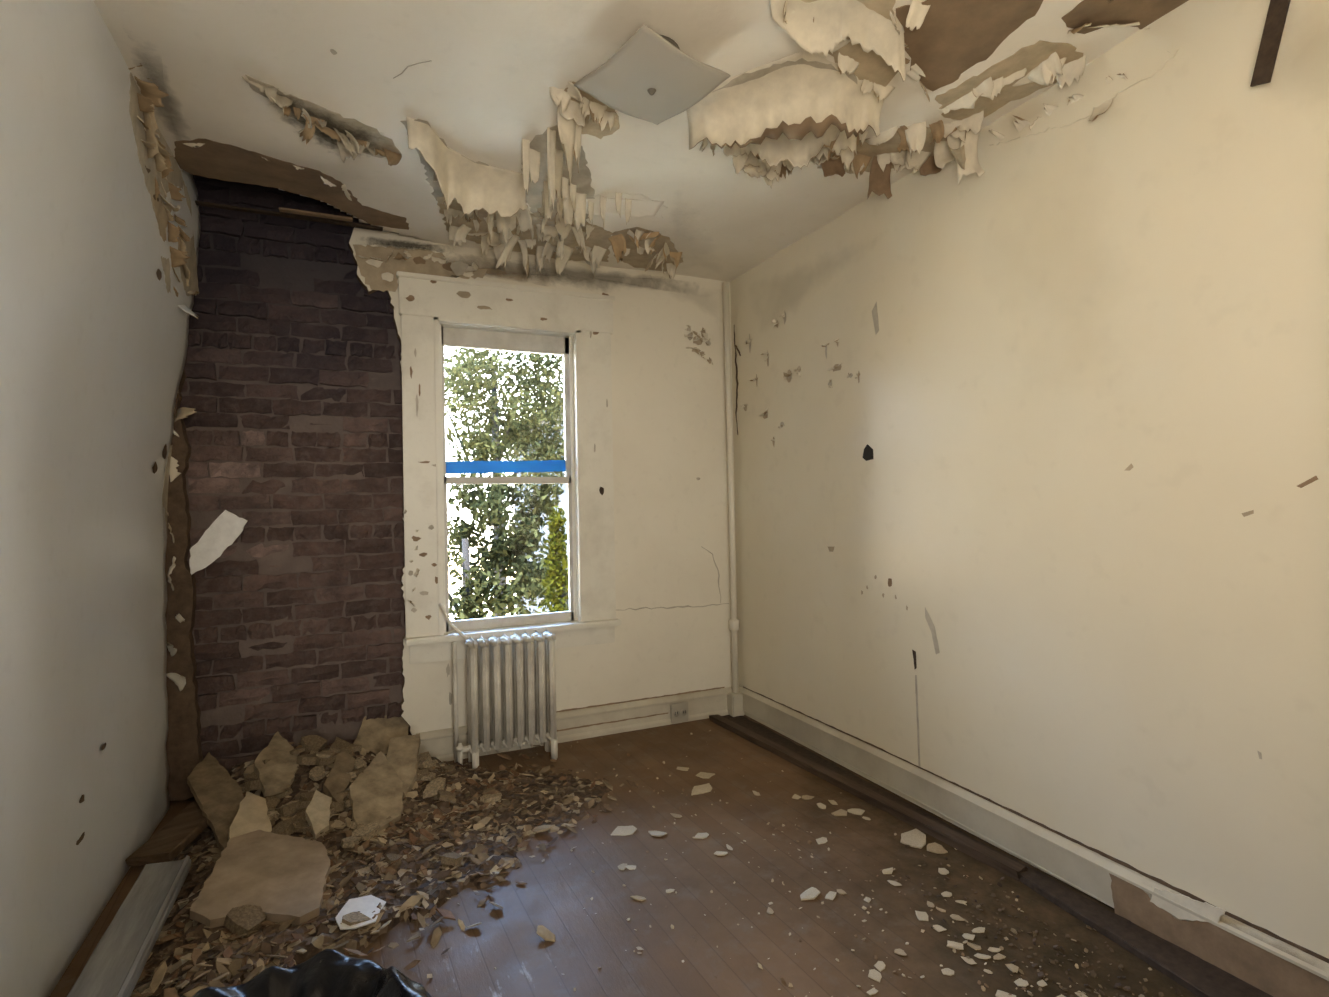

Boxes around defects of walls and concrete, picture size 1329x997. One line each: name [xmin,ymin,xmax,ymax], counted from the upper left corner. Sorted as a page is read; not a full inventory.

peeling [686,0,1189,199]
flaking render [128,63,683,801]
peeling [1109,873,1329,997]